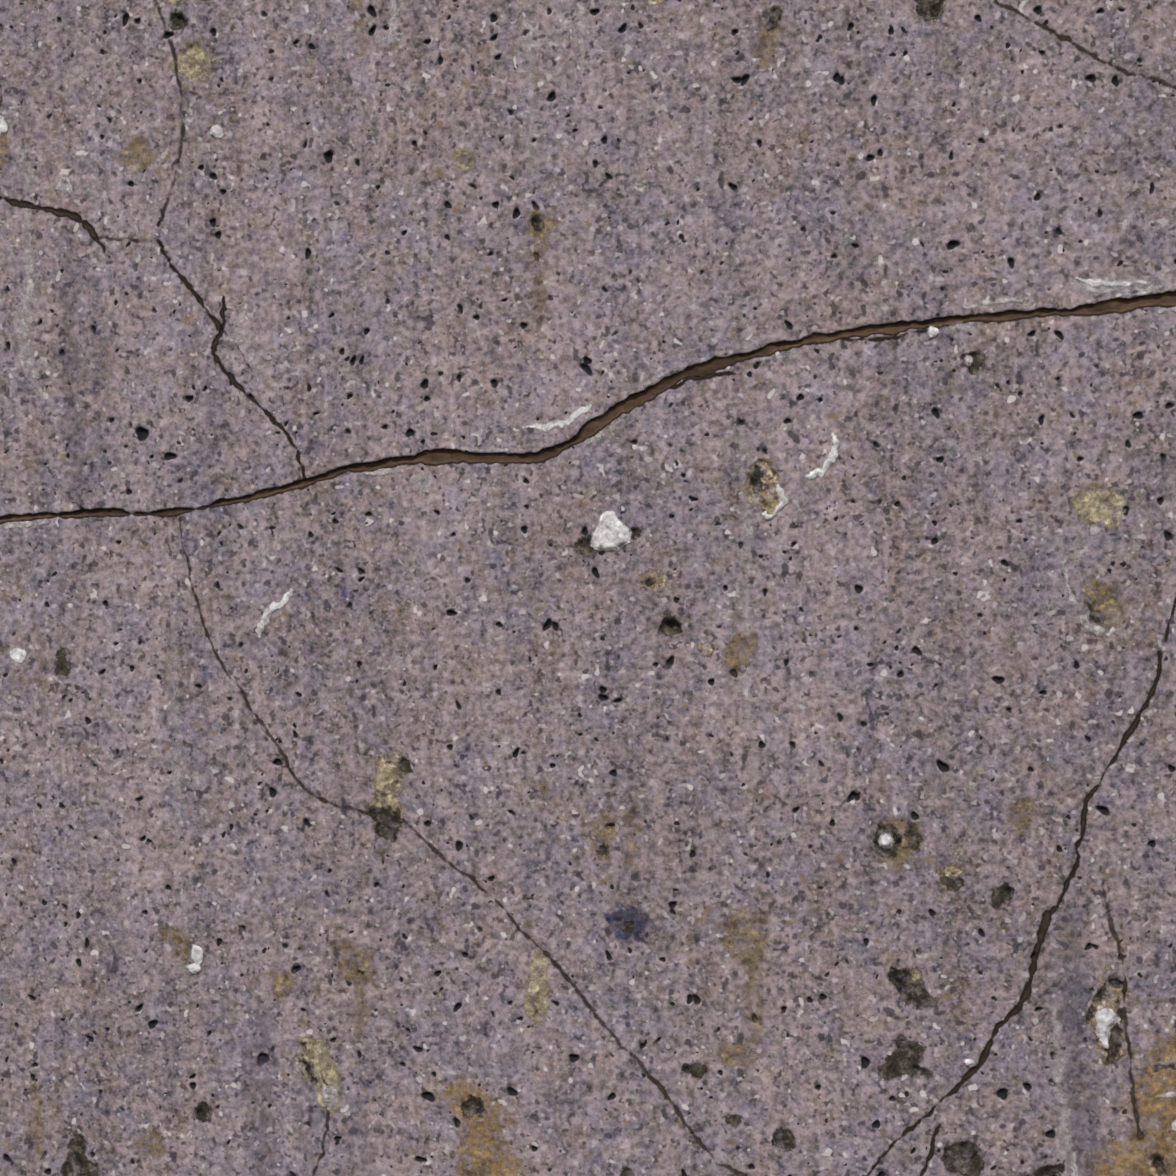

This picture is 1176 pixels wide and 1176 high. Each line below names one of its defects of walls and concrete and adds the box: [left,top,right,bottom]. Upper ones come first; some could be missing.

crack [158,6,197,161]
crack [994,0,1176,89]
crack [0,142,139,258]
crack [160,180,175,222]
crack [0,239,1176,1176]